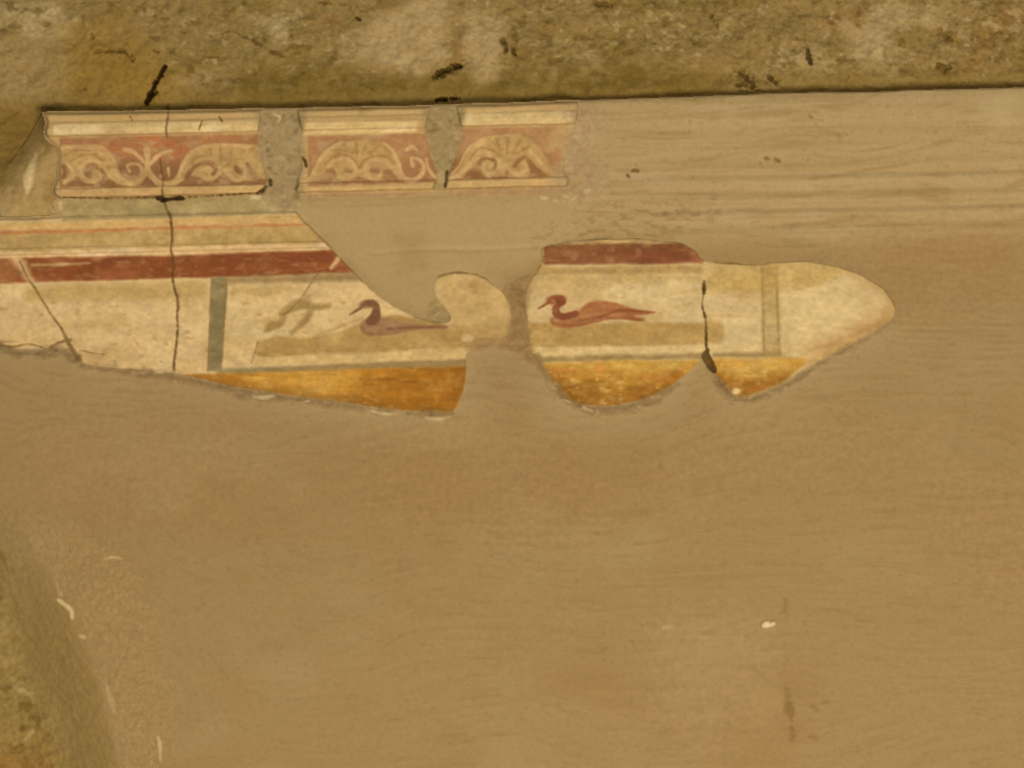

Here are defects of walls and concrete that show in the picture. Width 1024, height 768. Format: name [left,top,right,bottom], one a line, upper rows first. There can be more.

crack [62,103,259,372]
spalling [248,178,273,201]
crack [0,260,105,363]
crack [279,273,319,319]
crack [701,260,770,374]